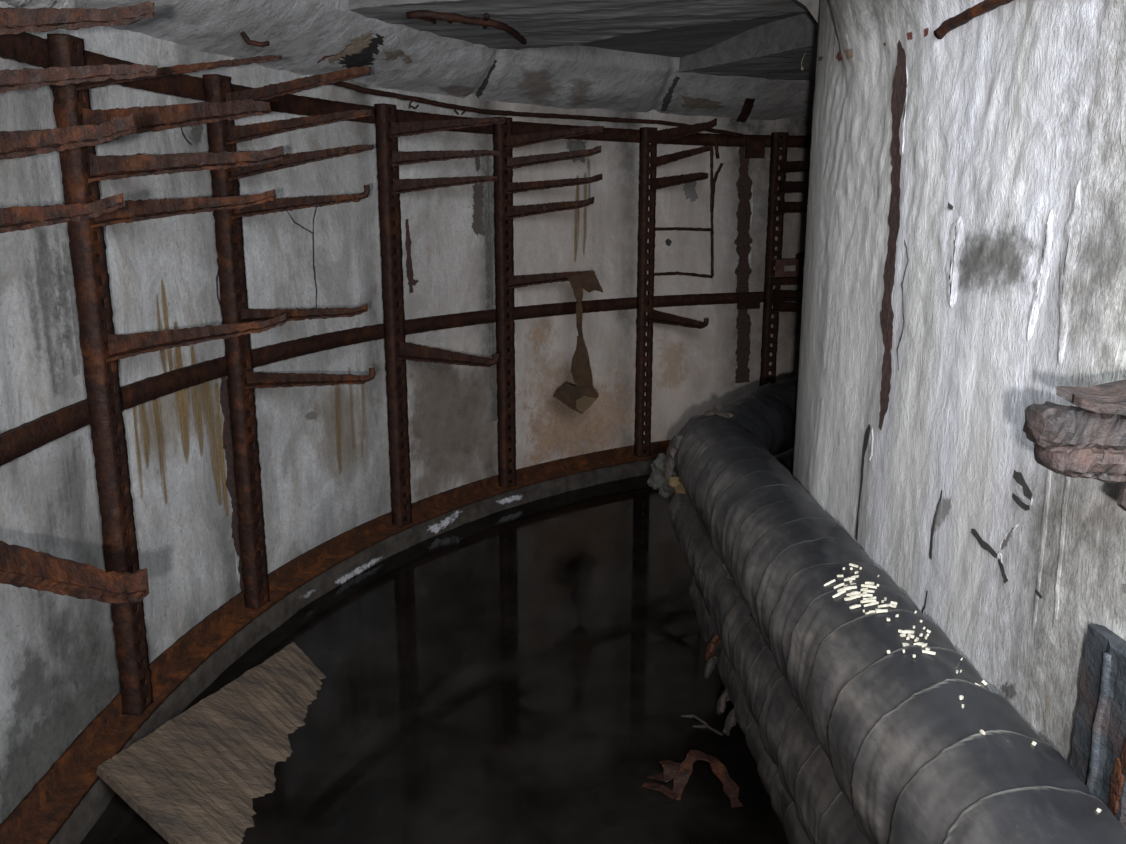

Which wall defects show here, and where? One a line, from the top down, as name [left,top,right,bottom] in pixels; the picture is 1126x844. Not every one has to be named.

rust [574,173,586,262]
leakage [959,225,1032,287]
rust [156,280,178,331]
rust [160,346,195,373]
rust [133,399,167,503]
rust [176,381,228,515]